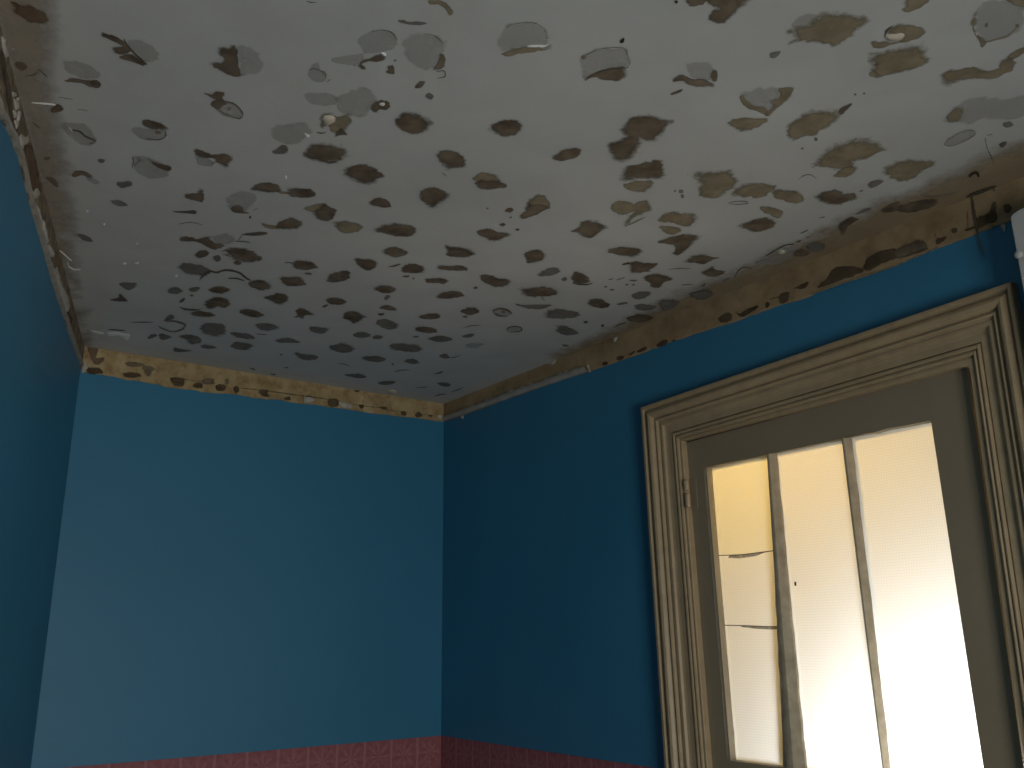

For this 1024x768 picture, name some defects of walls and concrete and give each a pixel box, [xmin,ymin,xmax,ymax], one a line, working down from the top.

flaking render [0,20,1024,422]
spalling [788,14,868,46]